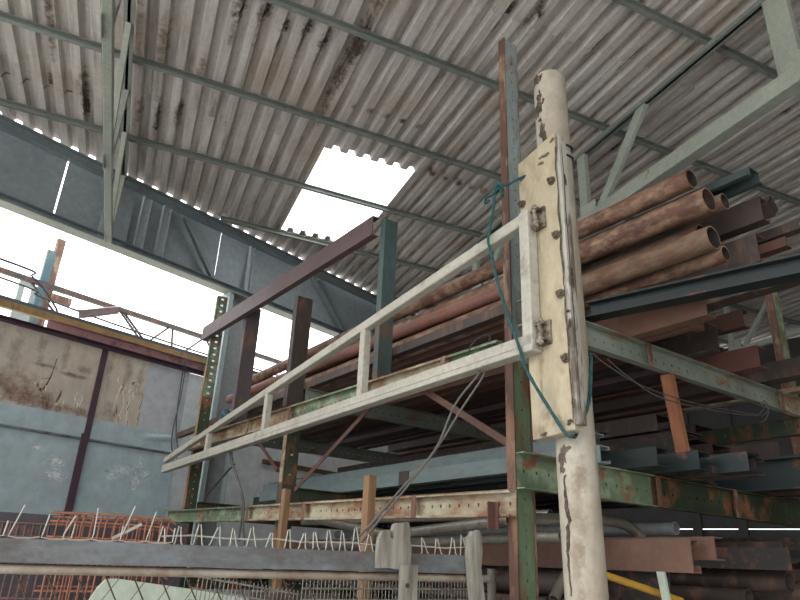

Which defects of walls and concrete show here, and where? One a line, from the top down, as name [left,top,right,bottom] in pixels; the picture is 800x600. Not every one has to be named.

damp [81,72,90,115]
damp [322,0,384,115]
peeling [534,74,554,166]
peeling [558,444,571,474]